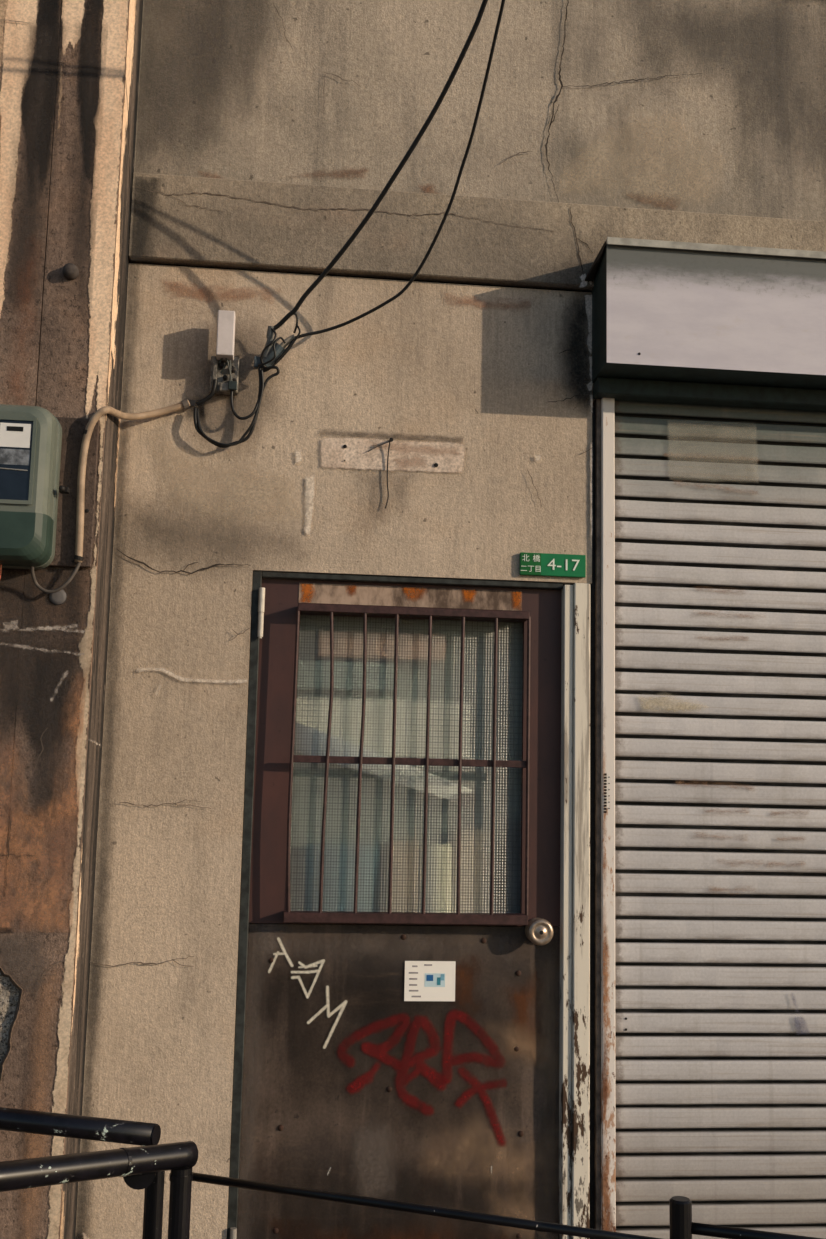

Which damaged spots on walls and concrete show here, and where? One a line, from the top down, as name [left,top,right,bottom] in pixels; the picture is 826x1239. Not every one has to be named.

water stain [12,0,62,300]
water stain [76,0,103,290]
crack [141,1,702,275]
crack [117,549,251,574]
rust [301,583,313,602]
rust [404,587,425,599]
rust [513,591,522,608]
rust [0,750,75,928]